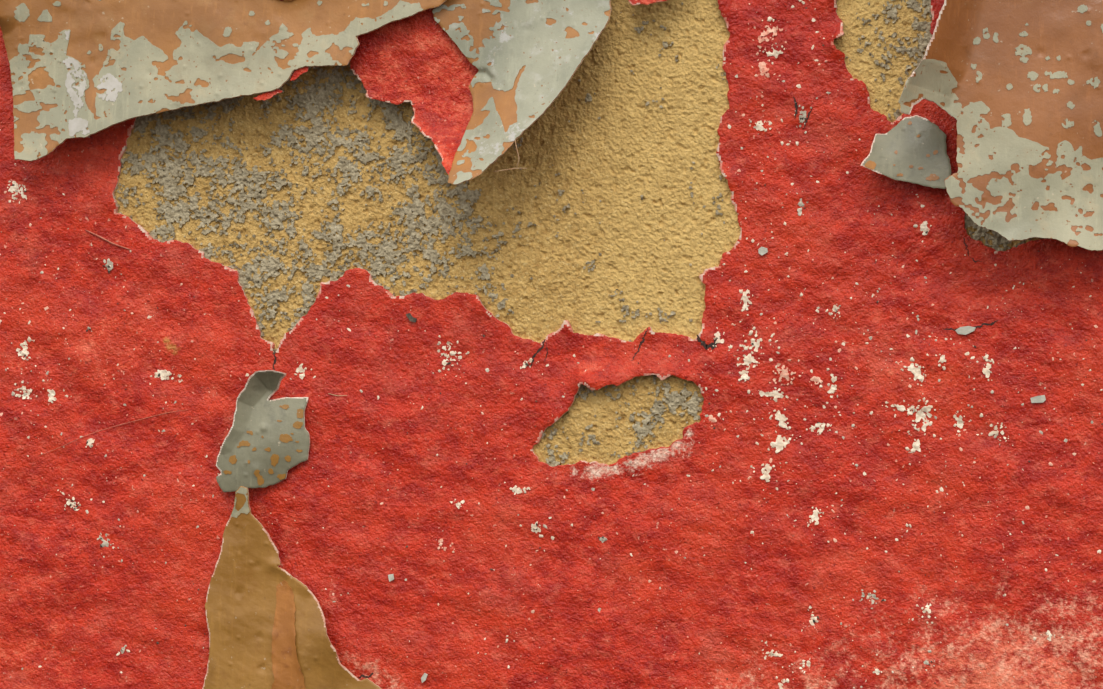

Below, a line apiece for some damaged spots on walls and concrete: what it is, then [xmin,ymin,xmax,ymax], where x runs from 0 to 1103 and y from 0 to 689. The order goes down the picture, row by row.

spalling [752,16,785,82]
spalling [781,97,818,146]
peeling [834,0,1103,251]
spalling [0,0,741,353]
spalling [729,280,753,311]
spalling [11,337,36,367]
spalling [11,373,72,406]
spalling [150,370,183,382]
spalling [428,341,470,384]
spalling [533,375,717,467]
spalling [712,324,852,491]
peeling [202,362,381,689]